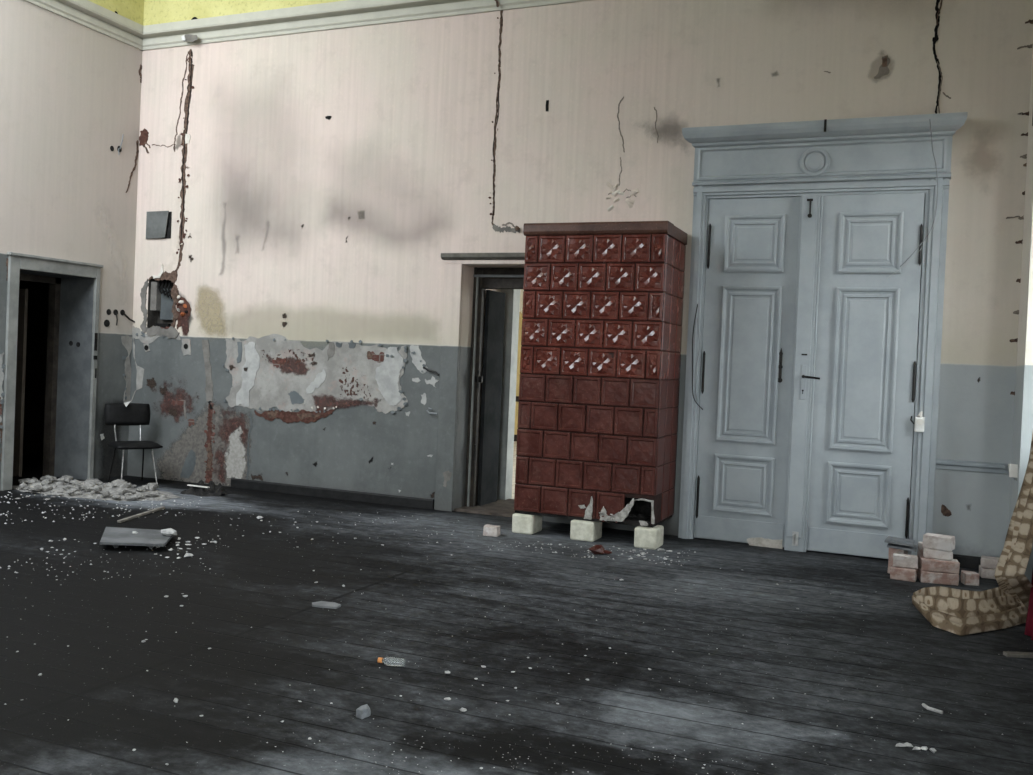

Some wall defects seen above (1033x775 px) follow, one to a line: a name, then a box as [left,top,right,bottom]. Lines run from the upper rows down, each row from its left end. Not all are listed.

crack [126,49,194,273]
crack [488,0,520,233]
crack [932,0,943,114]
peeling [121,264,439,487]
spalling [578,496,655,526]